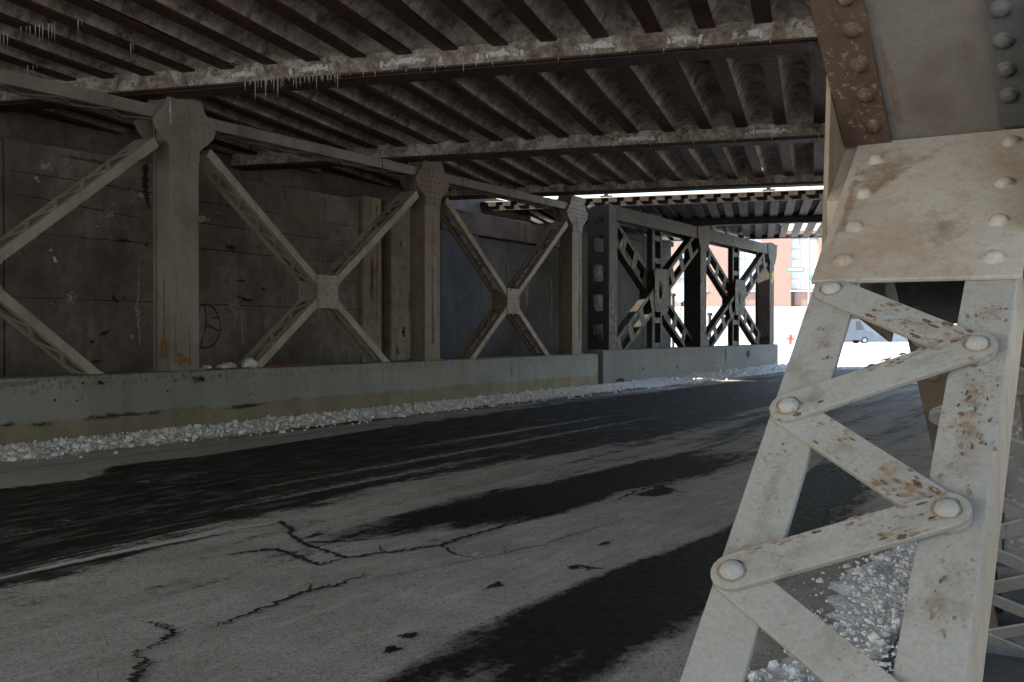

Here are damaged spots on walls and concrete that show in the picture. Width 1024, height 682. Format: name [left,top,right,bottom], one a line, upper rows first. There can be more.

leakage [84,164,150,227]